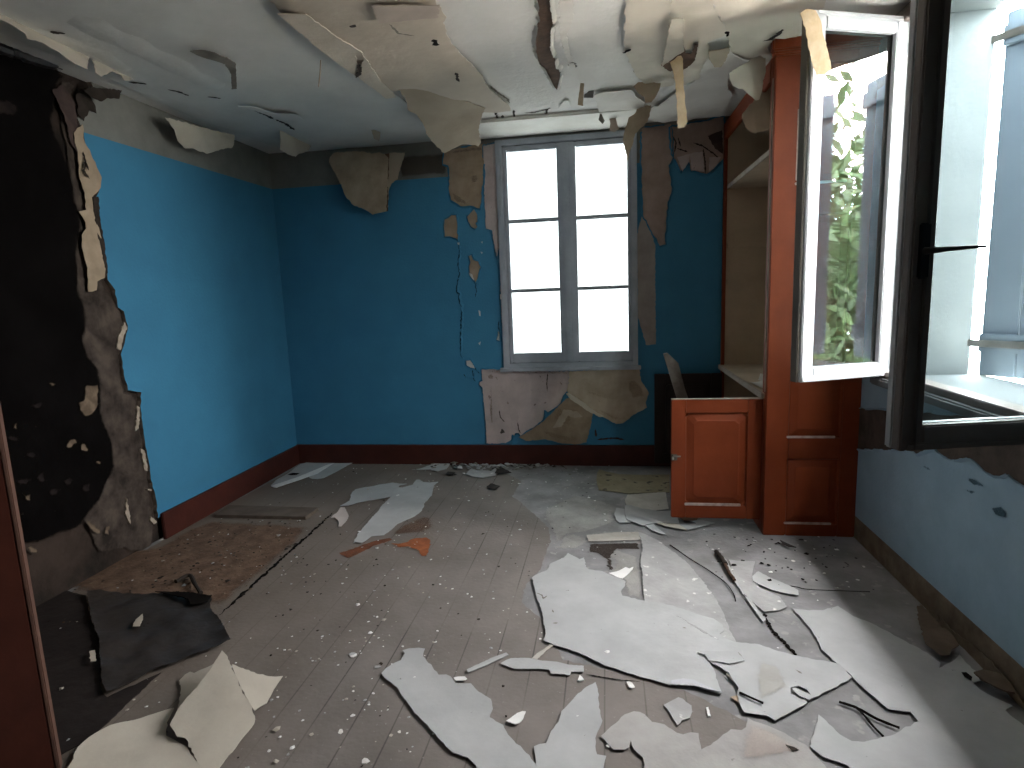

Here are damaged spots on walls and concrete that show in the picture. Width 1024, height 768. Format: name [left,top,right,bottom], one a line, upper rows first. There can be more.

peeling [442,142,499,284]
peeling [637,116,726,345]
flaking render [59,109,157,552]
flaking render [465,359,569,445]
flaking render [857,407,1024,493]